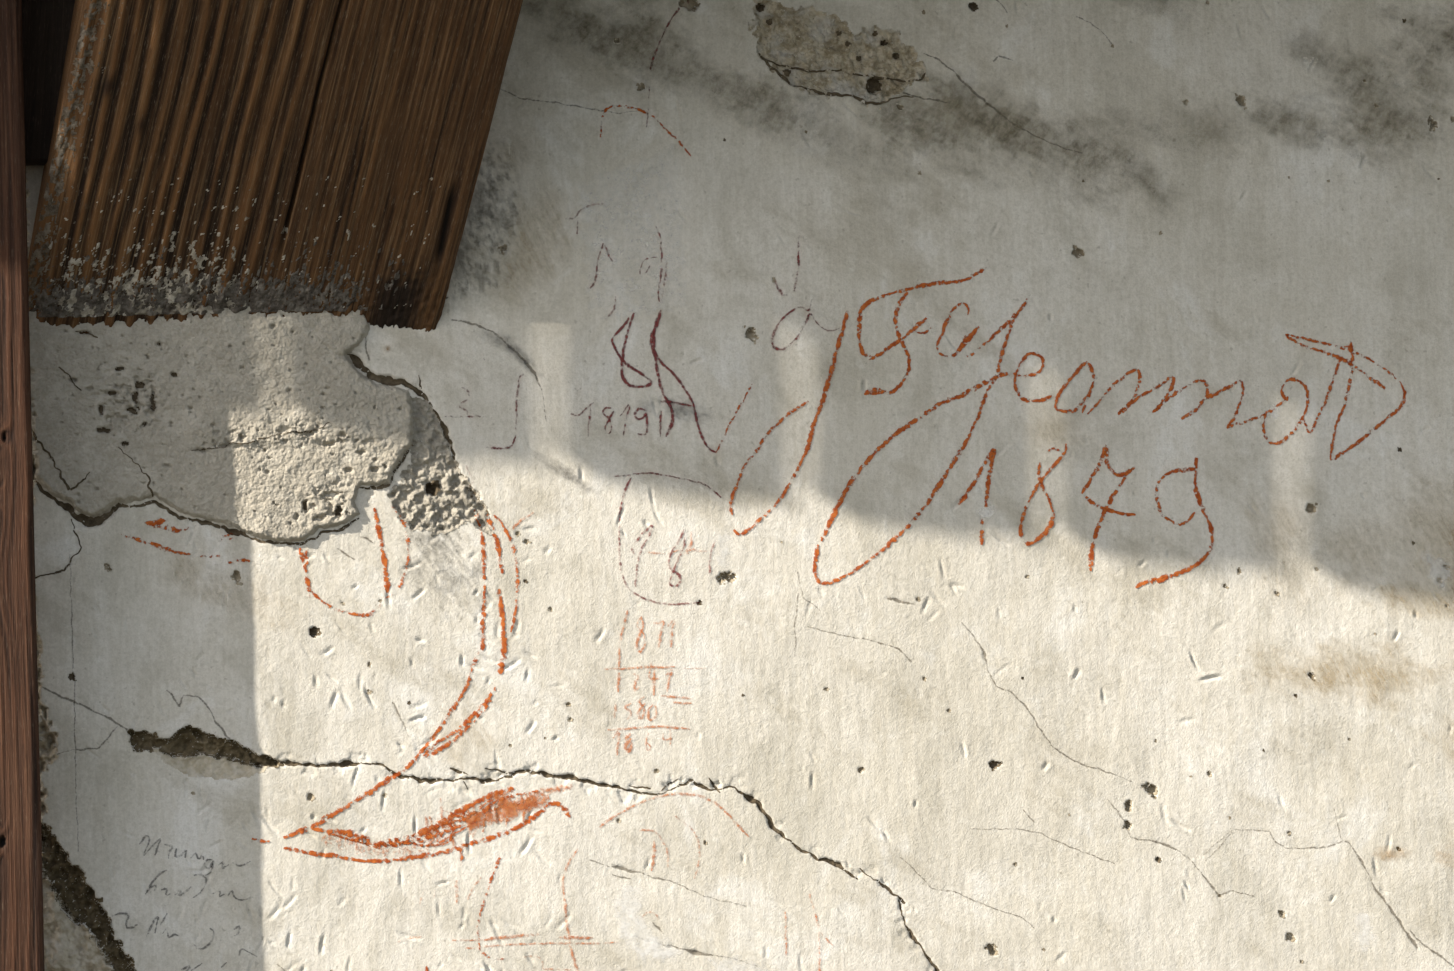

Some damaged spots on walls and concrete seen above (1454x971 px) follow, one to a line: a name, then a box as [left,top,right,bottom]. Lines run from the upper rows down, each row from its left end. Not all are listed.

spalling [748,0,929,110]
spalling [97,367,155,446]
spalling [387,396,493,537]
crack [41,615,1031,971]
crack [972,634,1242,896]
crack [1253,829,1452,965]